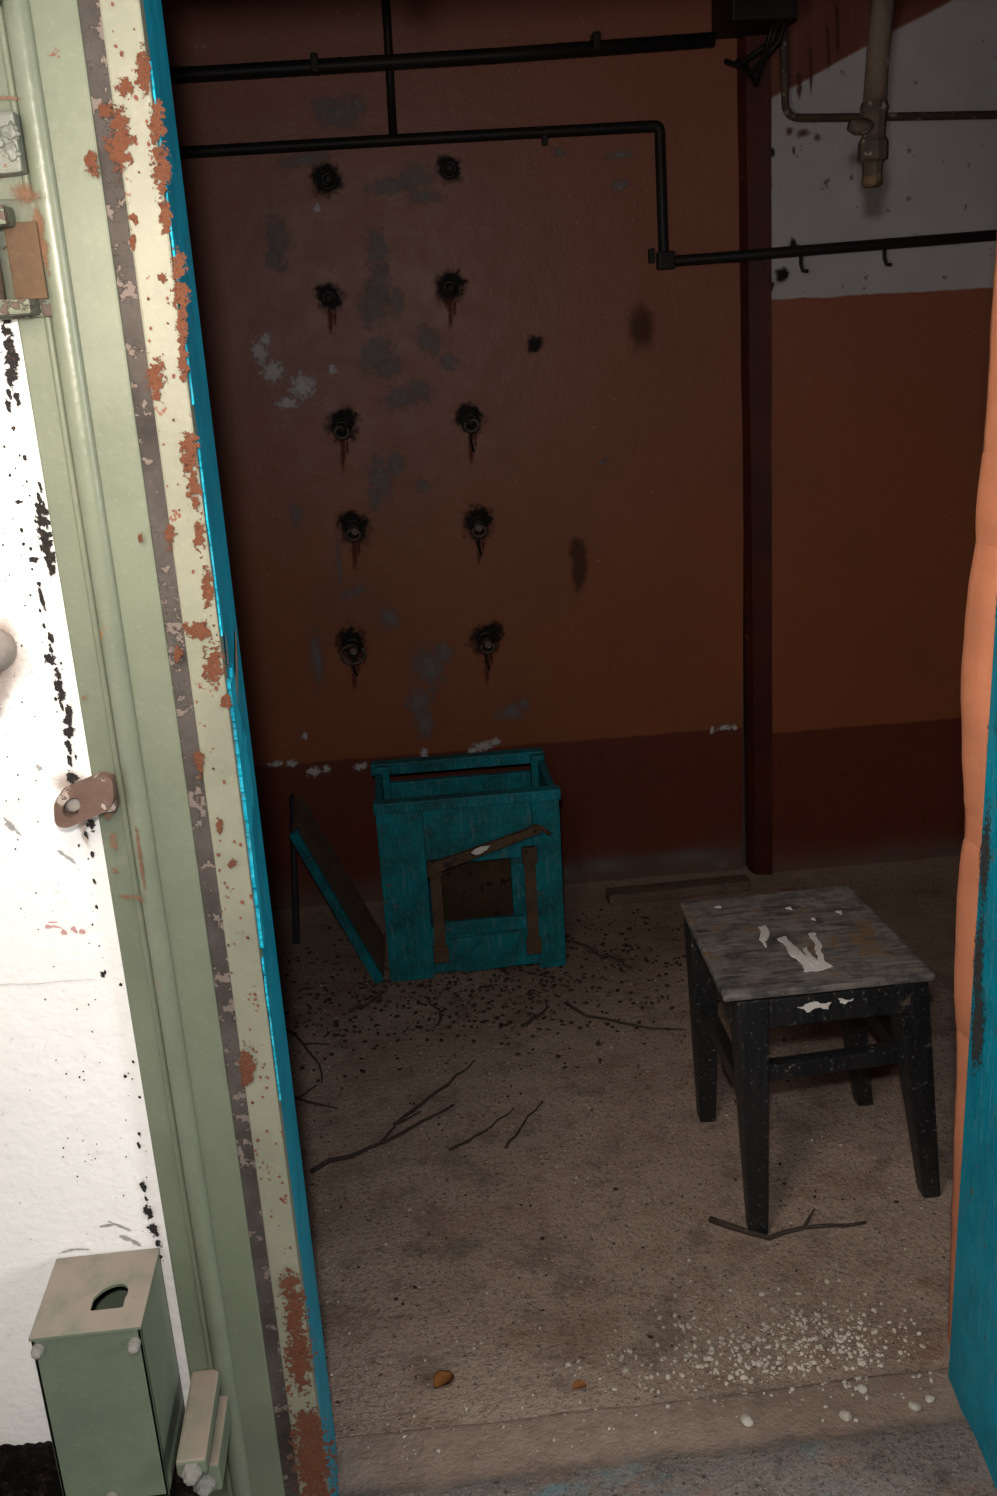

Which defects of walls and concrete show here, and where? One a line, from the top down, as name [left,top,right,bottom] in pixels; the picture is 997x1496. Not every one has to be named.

corrosion [83,28,191,403]
corrosion [162,419,232,709]
corrosion [192,747,226,784]
corrosion [215,817,249,946]
corrosion [238,1028,270,1104]
corrosion [270,1246,343,1496]